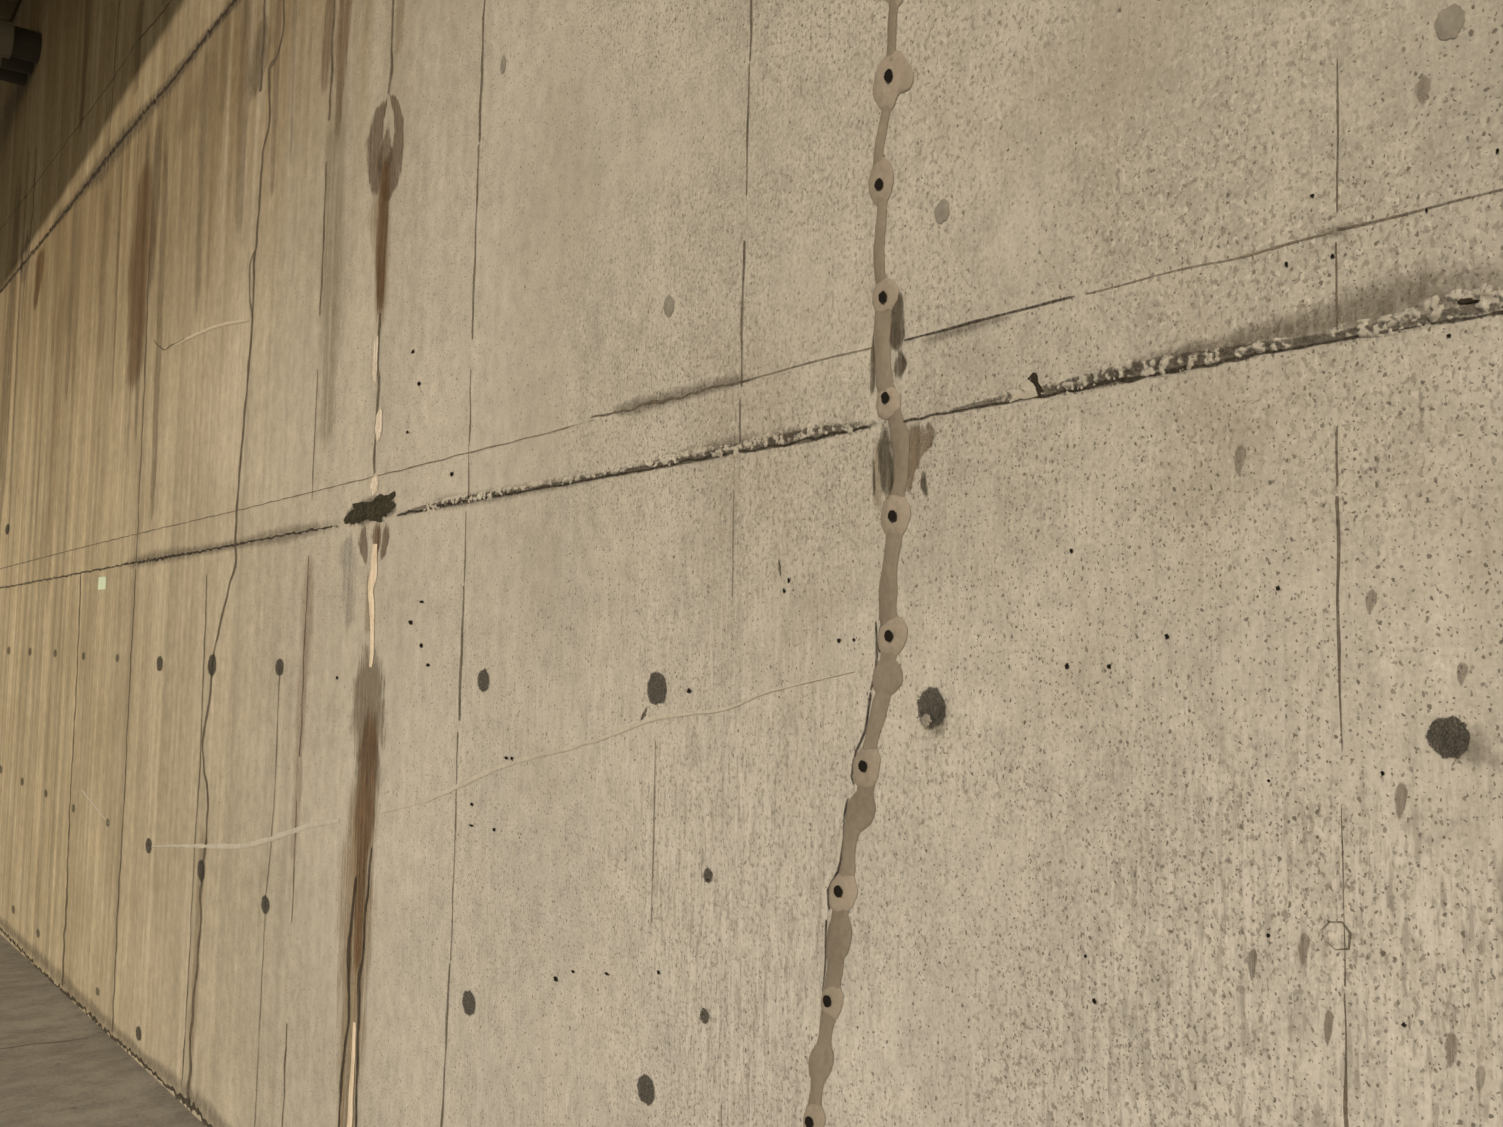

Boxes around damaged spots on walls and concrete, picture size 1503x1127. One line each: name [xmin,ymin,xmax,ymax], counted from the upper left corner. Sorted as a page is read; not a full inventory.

spalling [1327,280,1503,341]
spalling [983,337,1295,404]
spalling [343,491,395,524]
crack [0,0,337,1103]
crack [338,0,1503,1127]